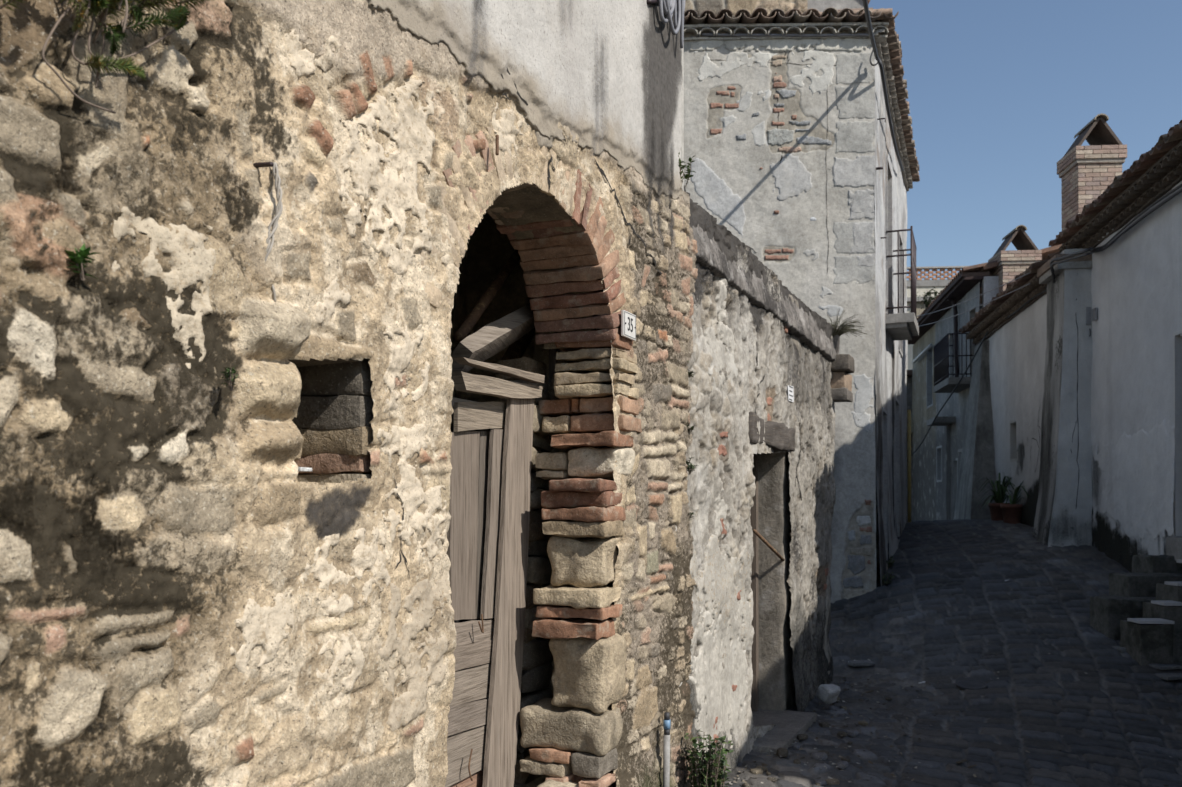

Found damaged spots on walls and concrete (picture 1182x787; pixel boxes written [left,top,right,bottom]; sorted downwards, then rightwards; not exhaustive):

peeling [283,29,341,78]
peeling [338,78,450,275]
peeling [368,0,690,204]
spalling [694,50,836,154]
water stain [1021,281,1148,573]
spalling [815,499,876,599]